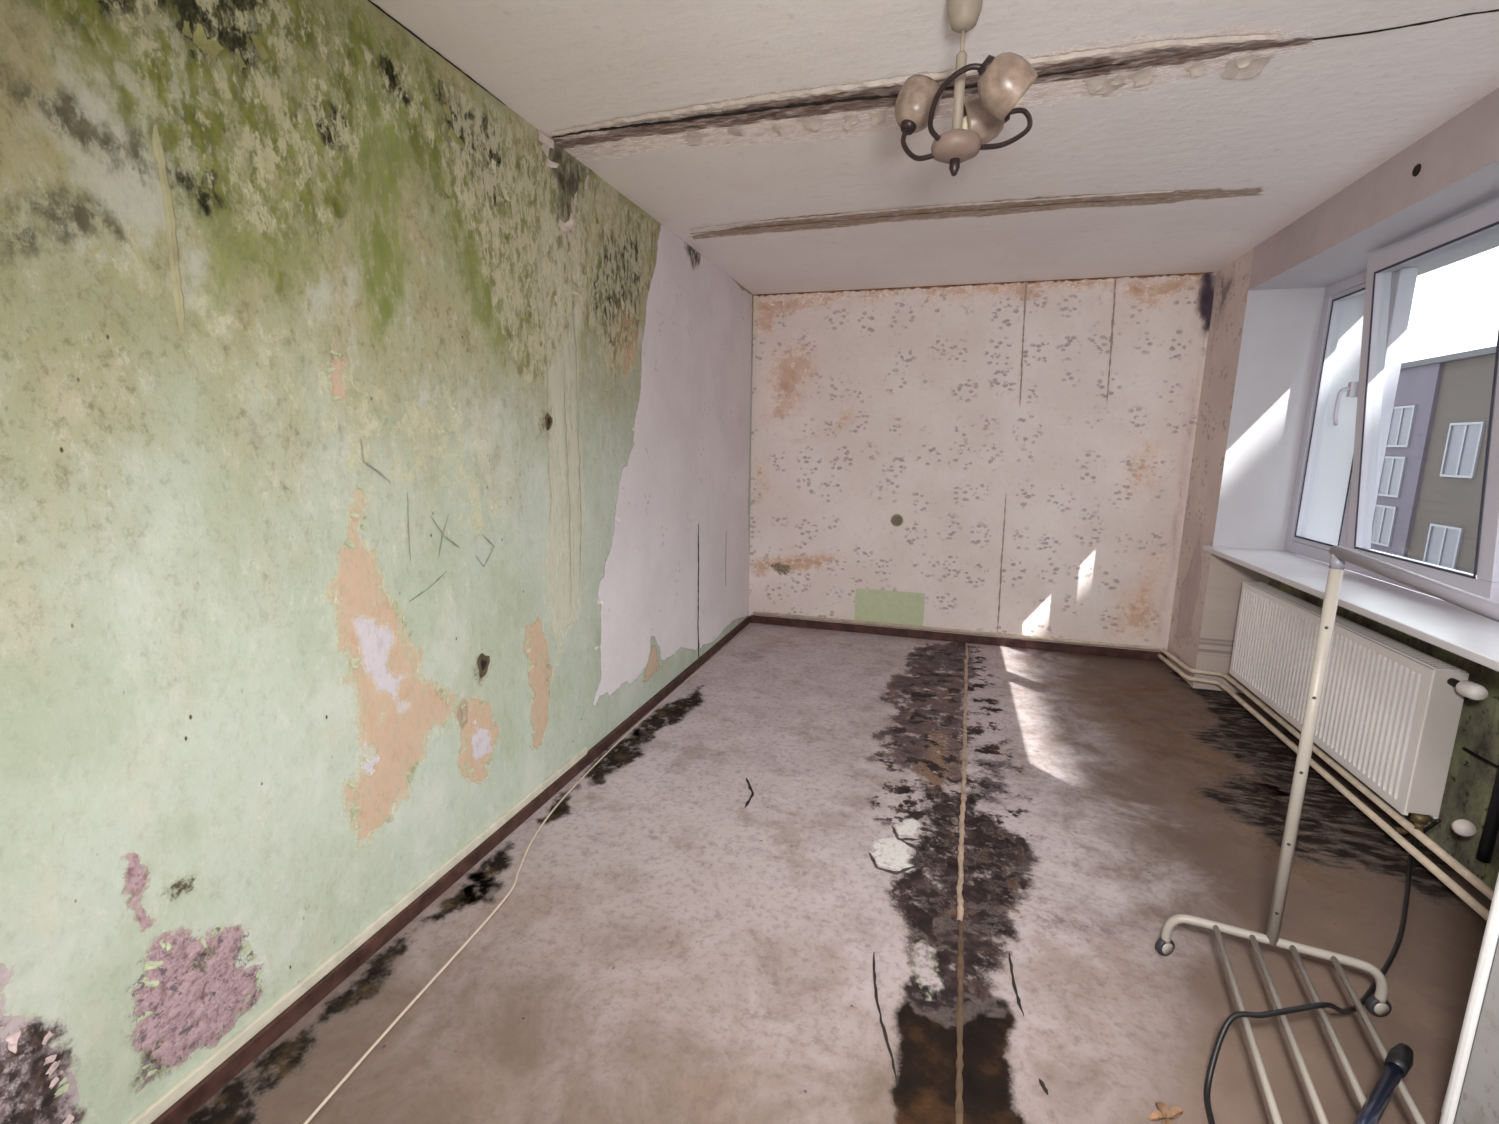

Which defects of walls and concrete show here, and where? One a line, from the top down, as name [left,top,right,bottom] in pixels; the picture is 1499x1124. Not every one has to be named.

water stain [8,83,146,173]
water stain [98,0,282,73]
crack [551,69,980,158]
crack [1014,9,1499,108]
water stain [315,49,412,341]
crack [689,188,1261,239]
peeling [328,483,499,839]
peeling [524,617,552,748]
water stain [868,642,1041,1124]
peeling [0,964,79,1124]
water stain [0,1019,86,1124]
flaking render [130,922,263,1092]